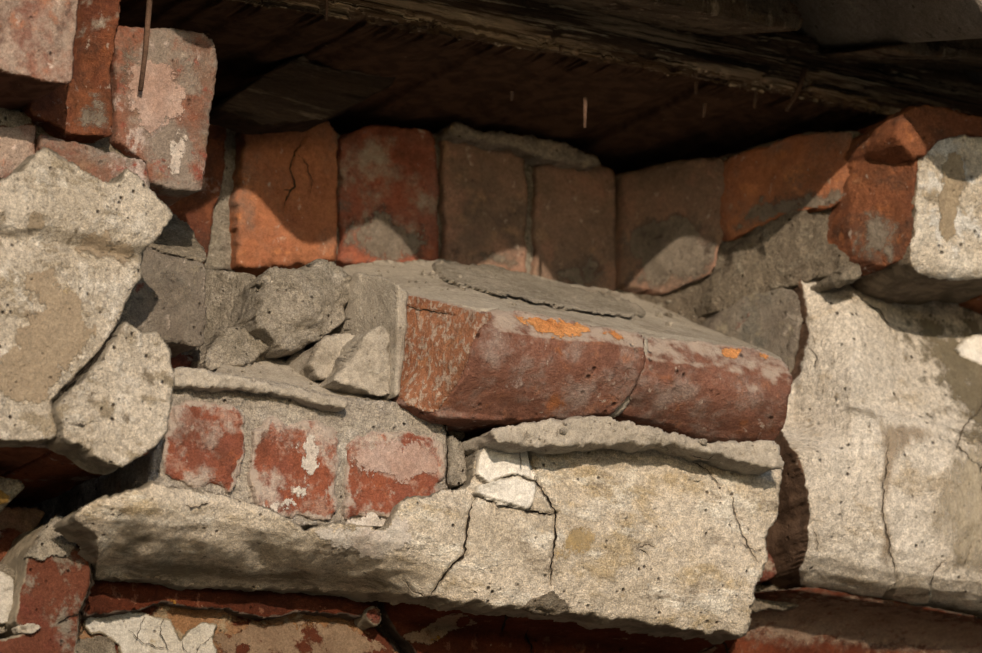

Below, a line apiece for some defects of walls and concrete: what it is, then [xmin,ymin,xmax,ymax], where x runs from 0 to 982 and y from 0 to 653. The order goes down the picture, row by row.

crack [284,141,313,211]
crack [52,318,123,401]
crack [443,424,468,482]
crack [955,405,982,471]
crack [403,454,557,599]
peeling [76,606,394,653]
crack [377,622,405,653]
peeling [403,613,477,645]